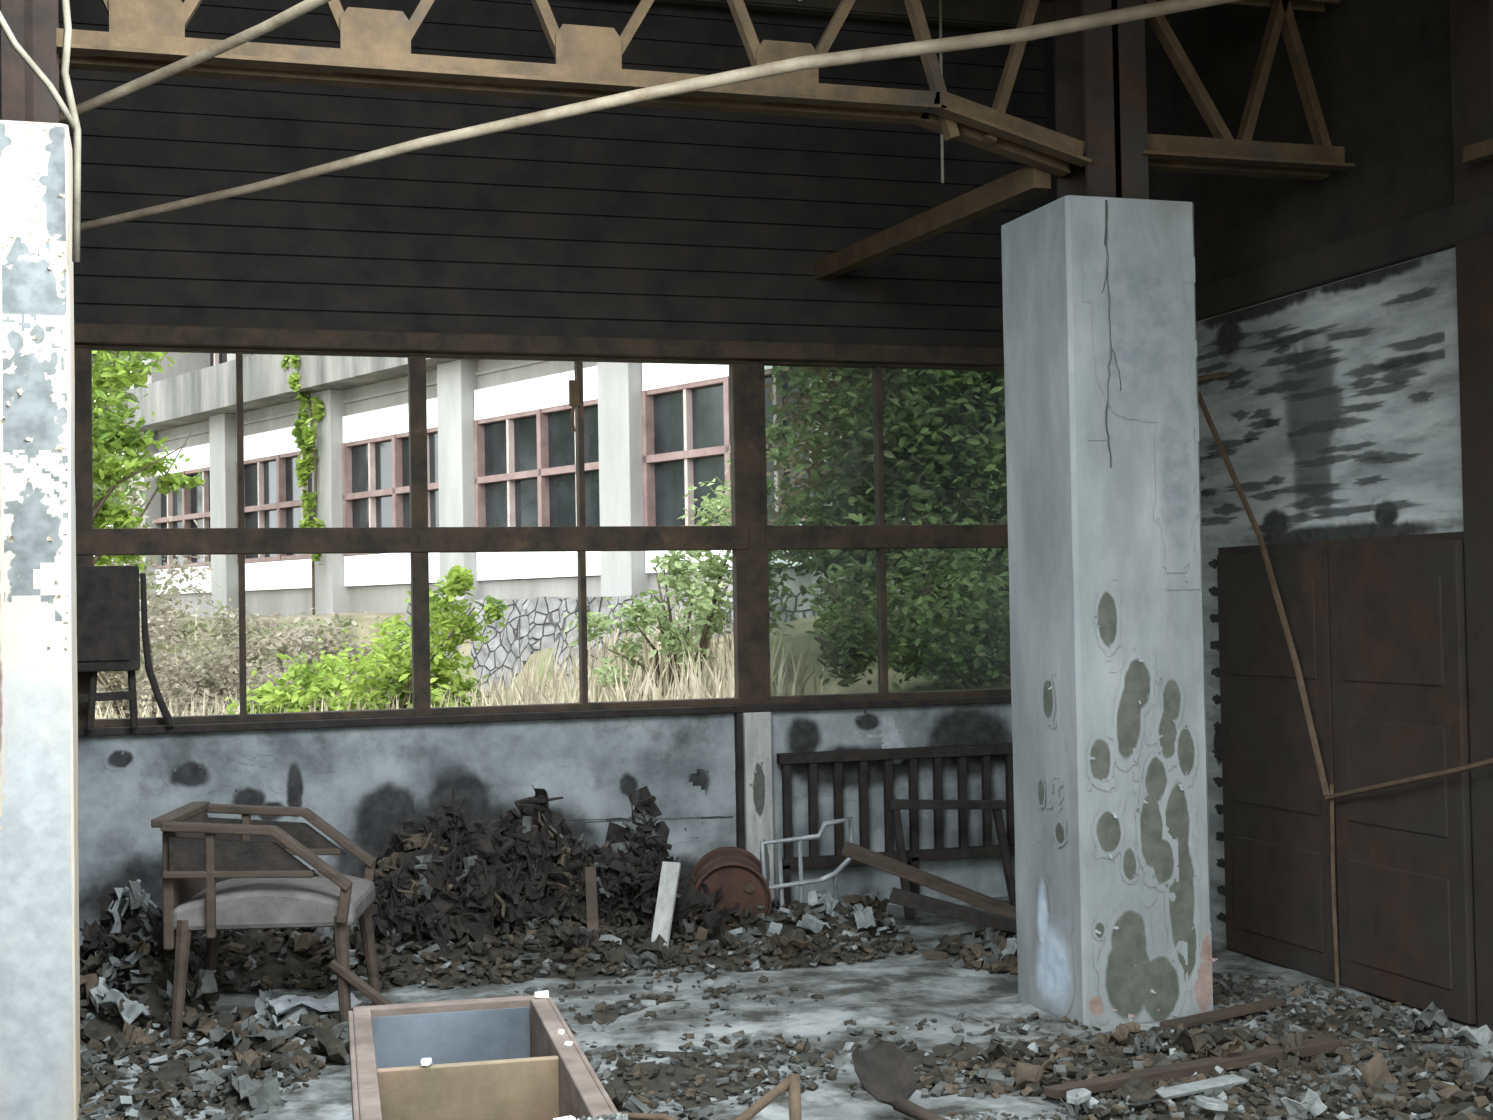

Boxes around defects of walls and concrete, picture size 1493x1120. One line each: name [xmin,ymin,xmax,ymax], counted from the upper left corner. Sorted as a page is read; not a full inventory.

peeling [0,123,70,654]
crack [1102,200,1121,468]
leakage [1082,229,1445,596]
peeling [1041,670,1056,729]
peeling [1087,579,1218,1027]
leakage [1210,641,1226,923]